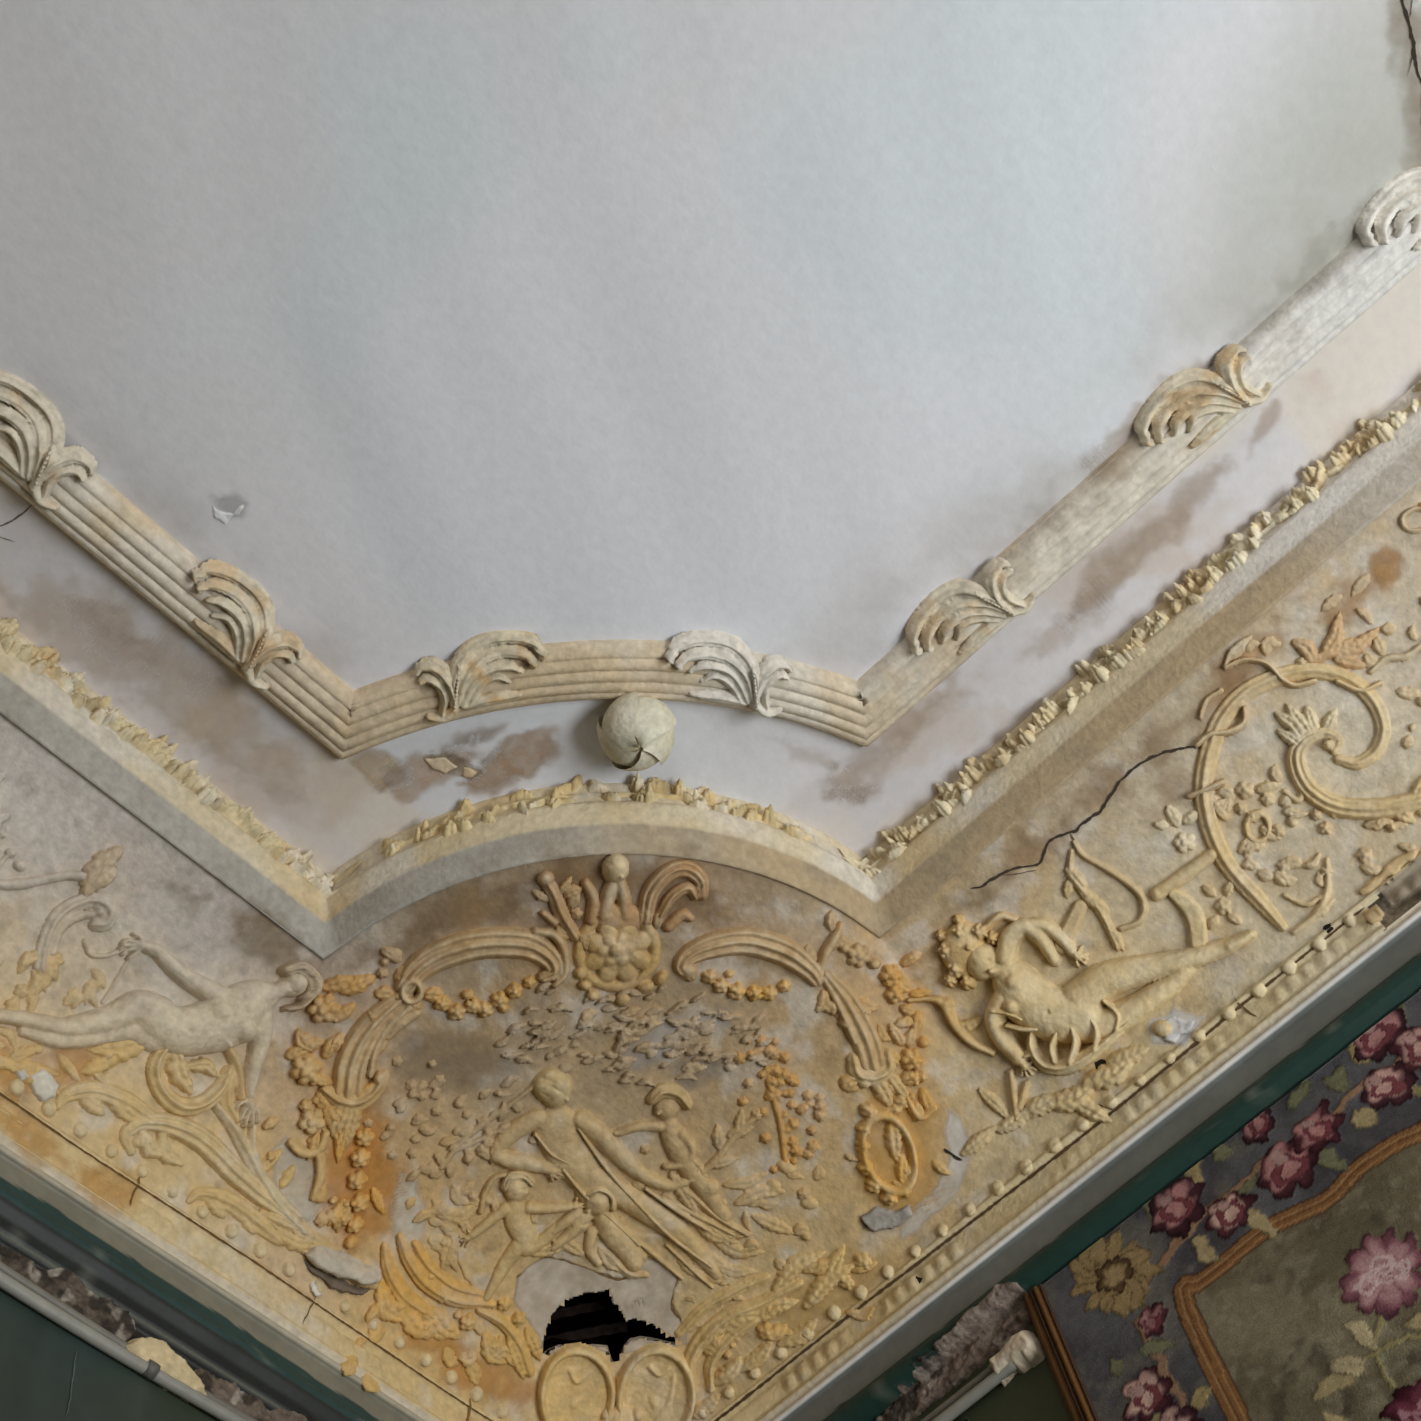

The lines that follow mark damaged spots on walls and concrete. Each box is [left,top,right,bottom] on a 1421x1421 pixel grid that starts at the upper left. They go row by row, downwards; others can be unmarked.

crack [1401,0,1421,82]
water stain [468,733,552,789]
crack [971,746,1201,889]
flaking render [273,1138,321,1219]
flaking render [392,1174,425,1250]
spalling [0,1244,137,1342]
peeling [304,1245,382,1297]
spalling [515,1257,686,1362]
spalling [875,1282,1033,1421]
spalling [194,1368,308,1421]